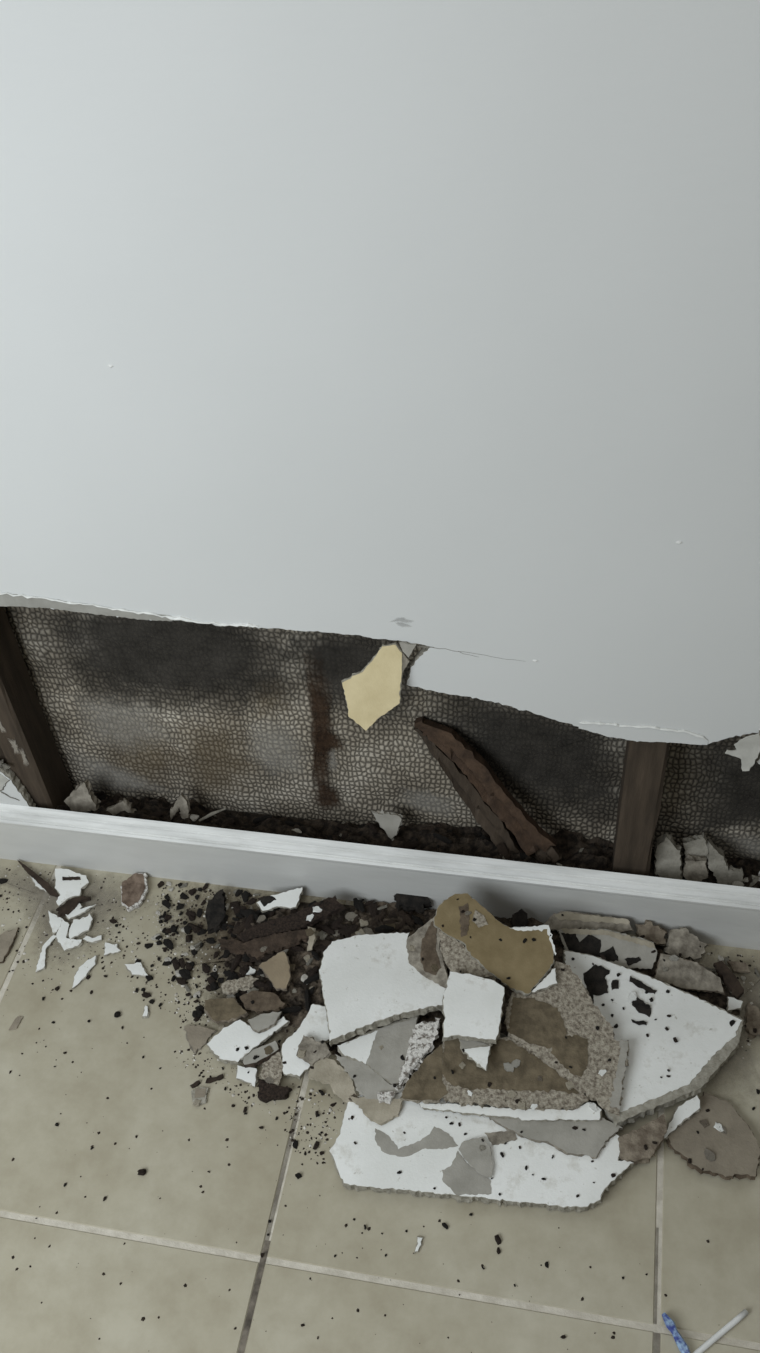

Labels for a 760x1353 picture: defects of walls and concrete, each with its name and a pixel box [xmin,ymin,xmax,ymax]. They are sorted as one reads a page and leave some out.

damp [54,613,395,703]
spalling [0,592,545,841]
damp [387,664,410,713]
damp [450,696,619,811]
spalling [499,721,760,887]
damp [694,739,760,829]